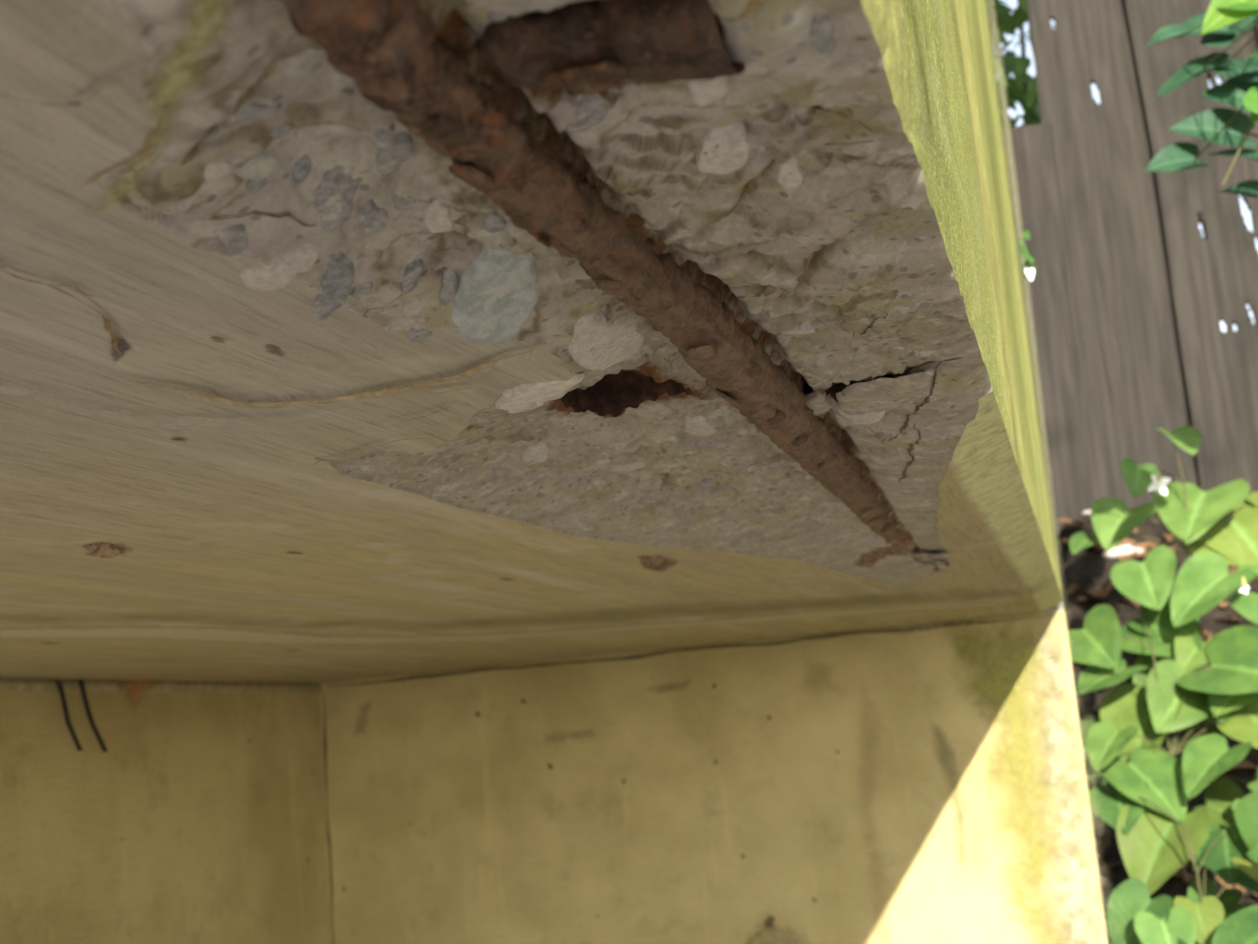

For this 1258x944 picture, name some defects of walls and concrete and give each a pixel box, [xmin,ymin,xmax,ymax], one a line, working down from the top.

crack [0,265,547,465]
spalling [100,0,993,586]
crack [882,361,942,483]